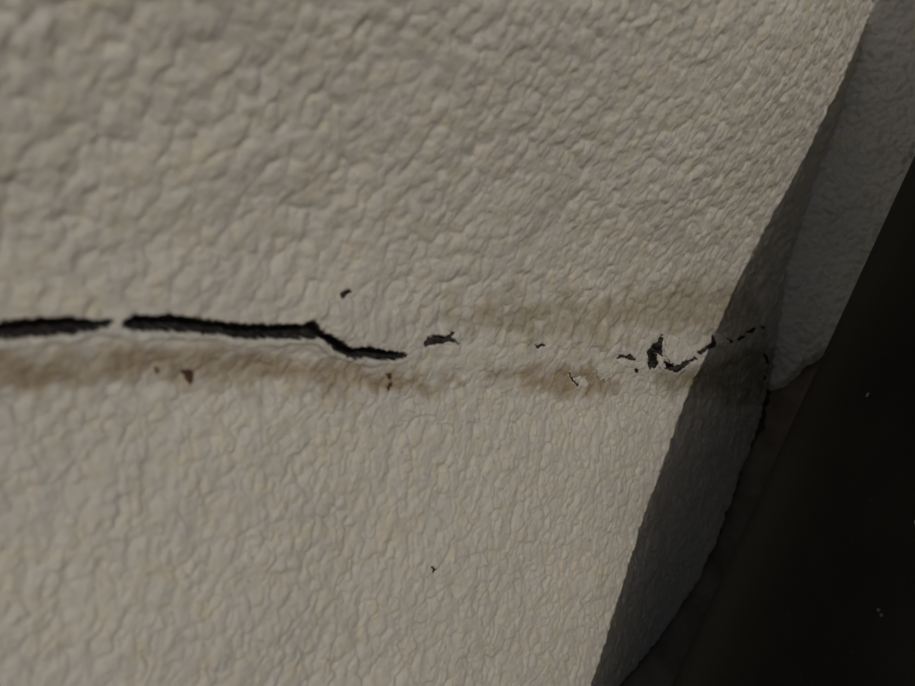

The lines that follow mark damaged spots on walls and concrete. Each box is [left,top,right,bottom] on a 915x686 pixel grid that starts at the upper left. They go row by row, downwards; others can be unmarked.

crack [0,313,407,361]
crack [568,326,765,387]
crack [750,353,772,448]